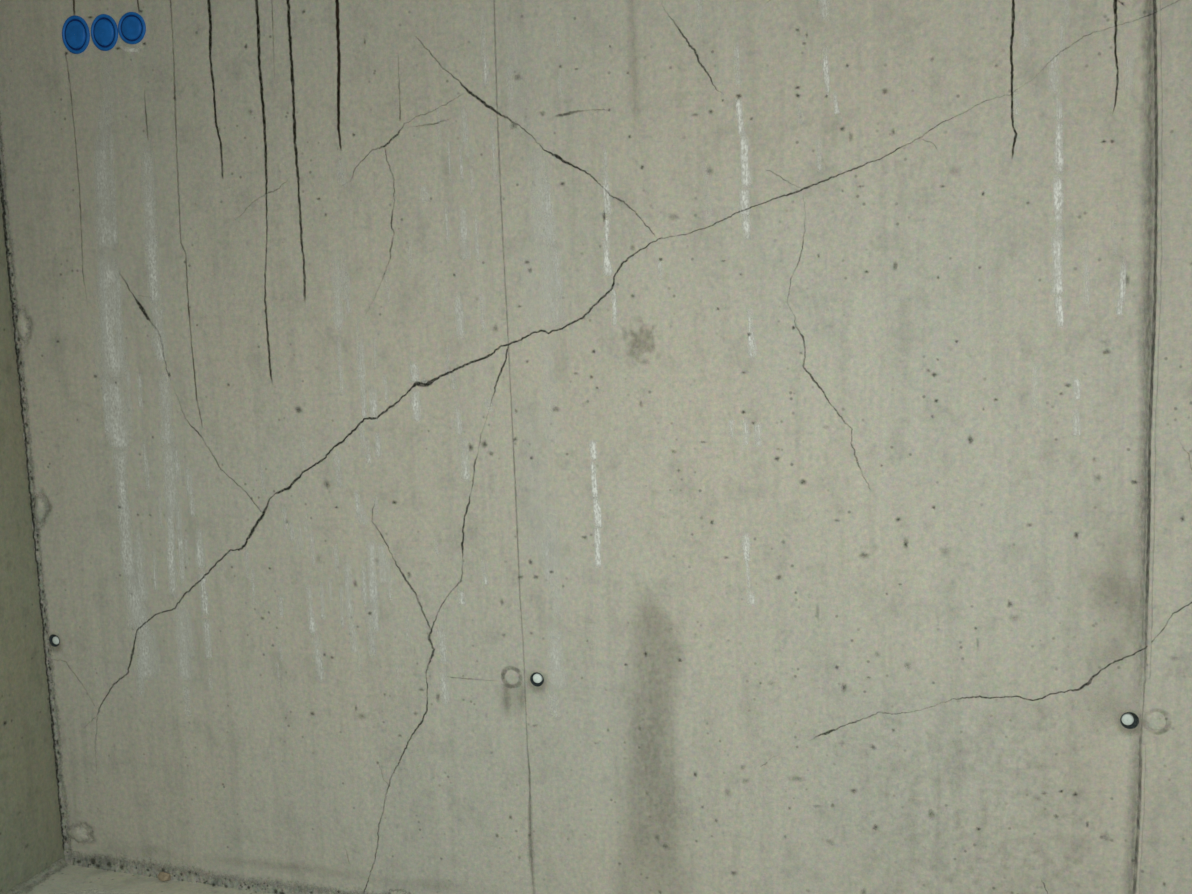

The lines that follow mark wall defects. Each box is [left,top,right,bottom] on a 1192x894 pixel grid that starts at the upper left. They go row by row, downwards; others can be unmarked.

crack [678,29,712,82]
crack [691,147,900,233]
crack [98,82,661,713]
crack [381,534,443,764]
crack [965,642,1152,701]